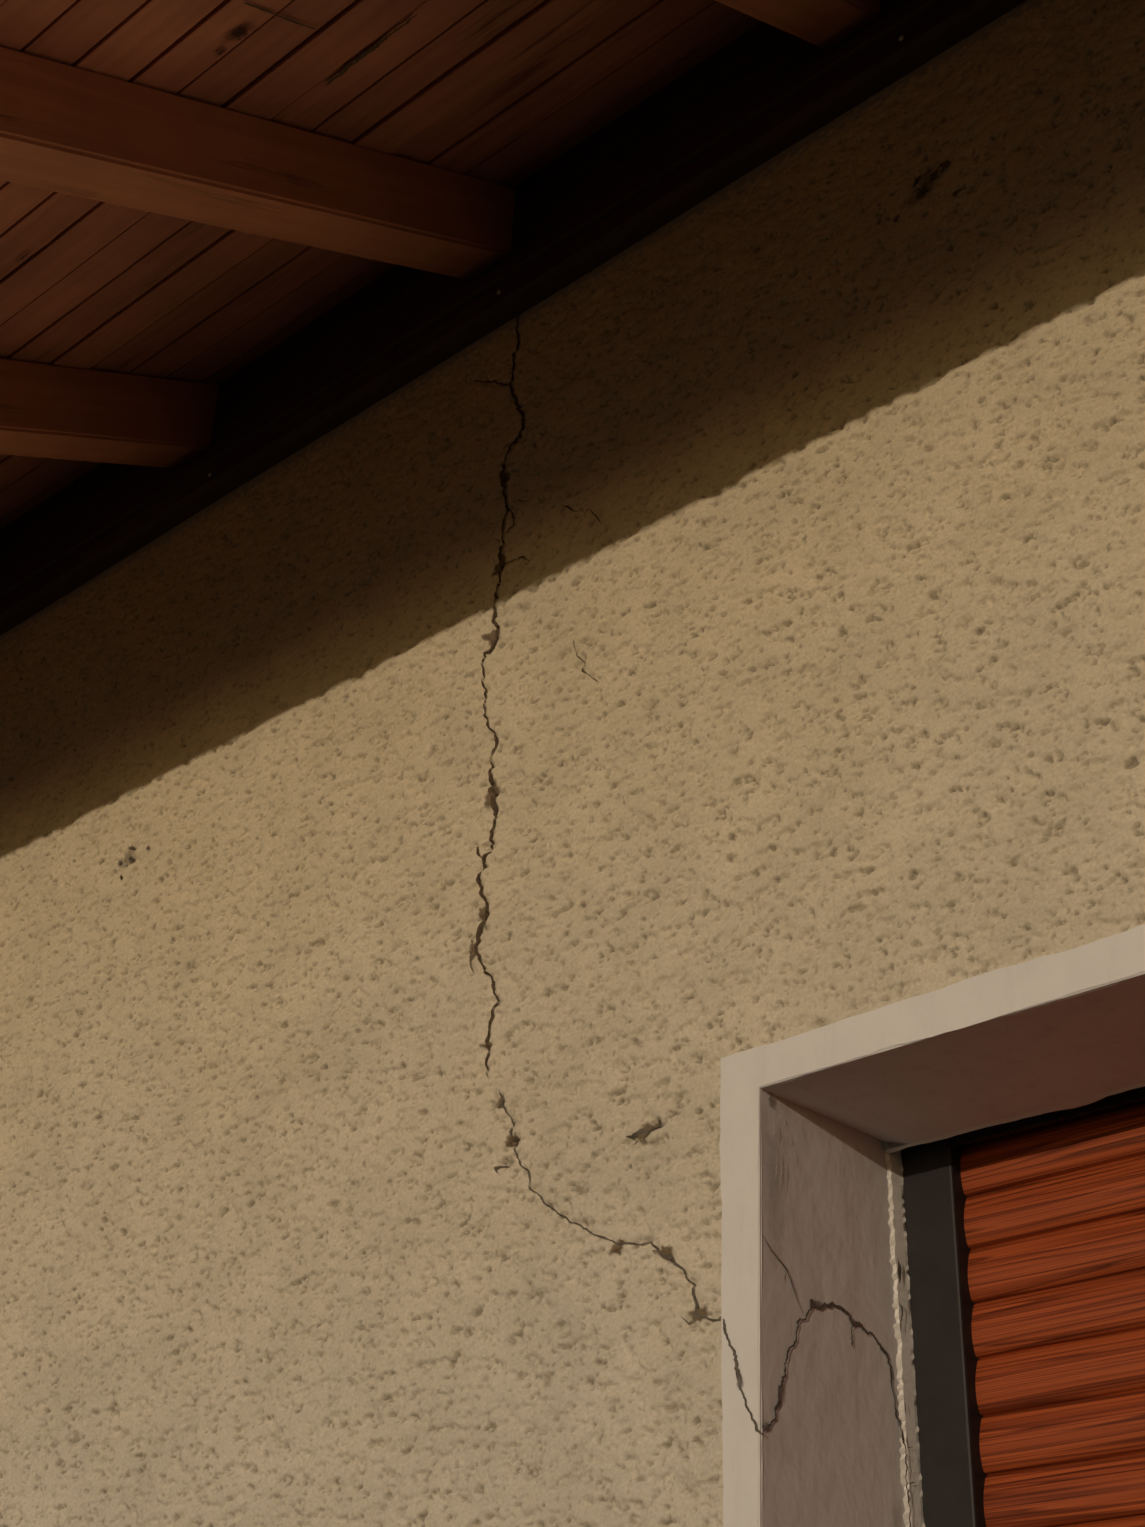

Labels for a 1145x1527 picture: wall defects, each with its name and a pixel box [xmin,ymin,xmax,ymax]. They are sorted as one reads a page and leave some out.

crack [469,312,915,1527]